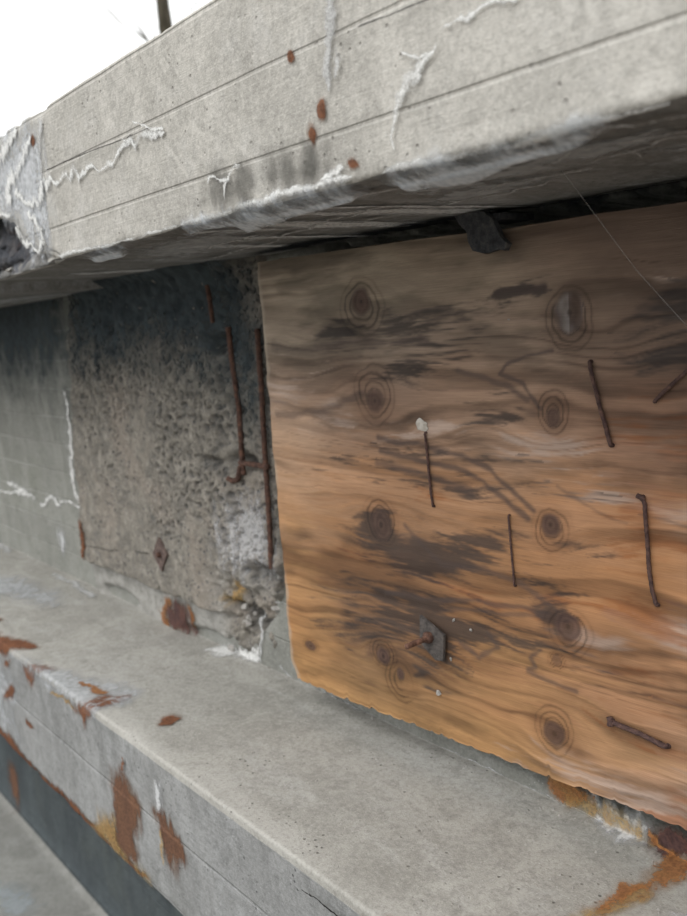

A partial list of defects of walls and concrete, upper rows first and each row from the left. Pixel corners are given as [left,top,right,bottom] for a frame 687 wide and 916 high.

crack [358,0,427,27]
crack [38,119,164,192]
crack [207,164,240,199]
spalling [0,212,65,281]
water stain [0,126,686,406]
crack [0,392,80,508]
spalling [52,256,285,652]
rust [225,327,274,569]
rust [0,635,37,666]
rust [0,730,149,880]
rust [153,807,185,874]
rust [547,777,687,916]